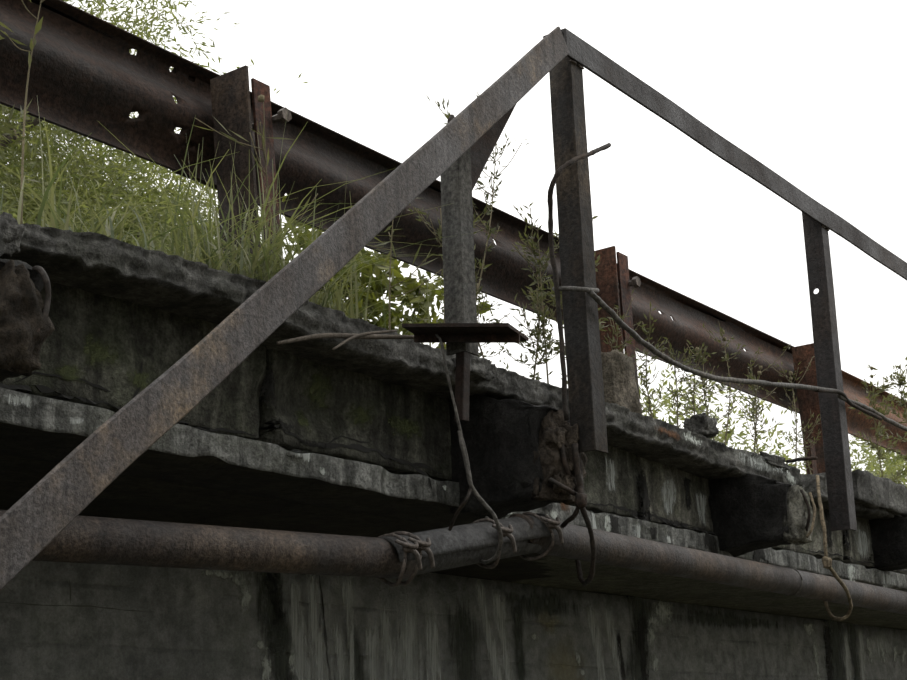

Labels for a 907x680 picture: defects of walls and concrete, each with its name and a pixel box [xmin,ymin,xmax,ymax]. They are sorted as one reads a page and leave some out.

water stain [255,572,328,680]
water stain [333,578,578,680]
water stain [588,595,652,680]